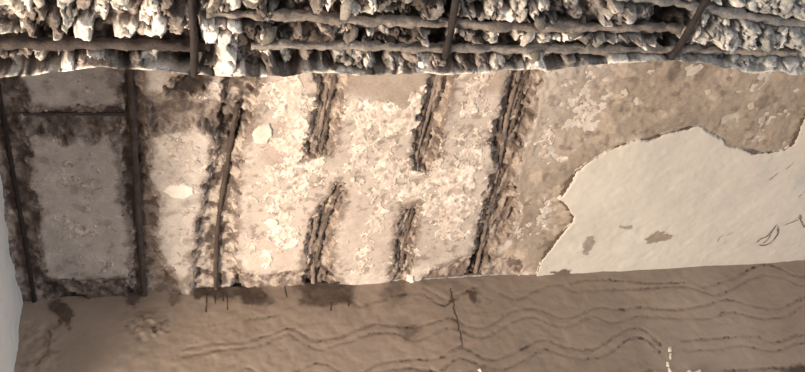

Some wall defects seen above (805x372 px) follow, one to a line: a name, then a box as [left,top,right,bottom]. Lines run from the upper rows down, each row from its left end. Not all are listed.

spalling [0,0,220,303]
spalling [189,0,805,293]
crack [441,288,463,347]